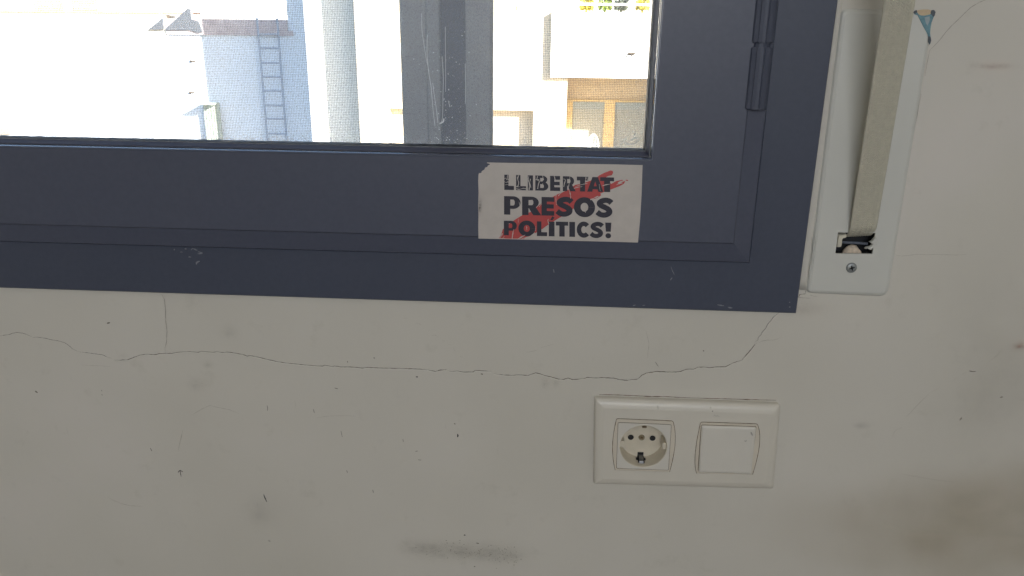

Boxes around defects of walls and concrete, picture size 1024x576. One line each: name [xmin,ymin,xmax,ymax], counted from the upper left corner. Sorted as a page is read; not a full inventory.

crack [3,291,806,383]